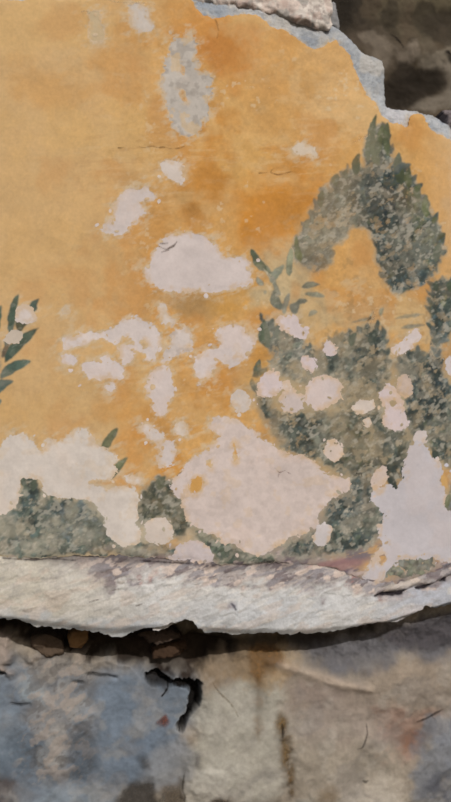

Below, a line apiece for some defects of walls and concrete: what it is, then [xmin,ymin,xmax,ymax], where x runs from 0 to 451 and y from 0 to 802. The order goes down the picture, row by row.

flaking render [159,30,213,137]
flaking render [95,186,161,236]
flaking render [144,230,260,298]
flaking render [391,328,421,357]
flaking render [351,374,413,432]
flaking render [0,303,352,564]
flaking render [362,430,451,585]
crack [375,564,450,596]
crack [146,668,198,723]